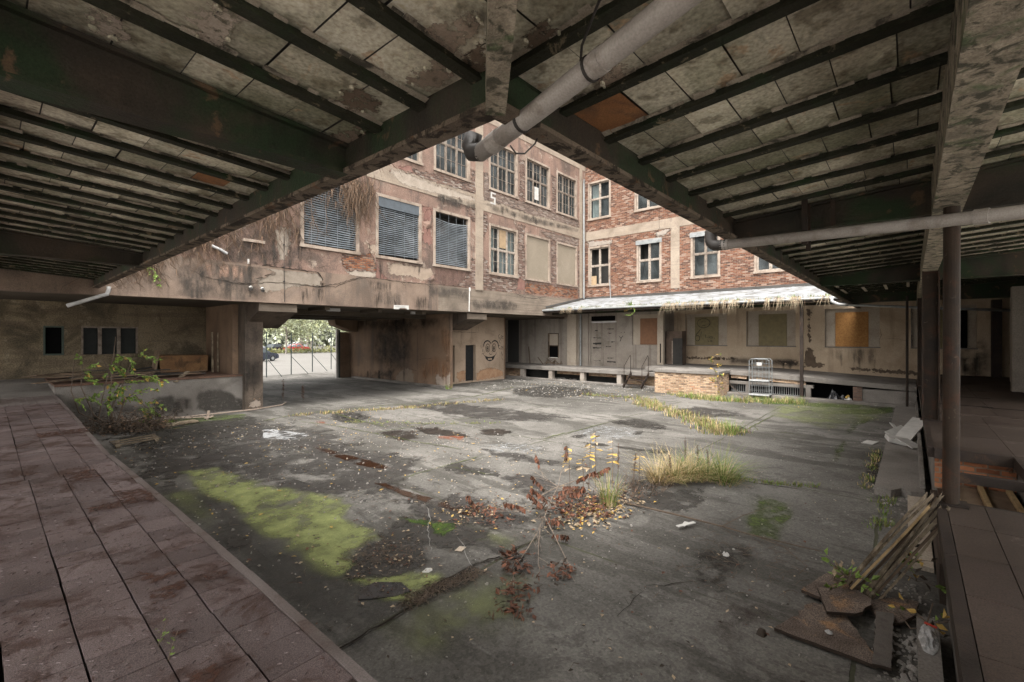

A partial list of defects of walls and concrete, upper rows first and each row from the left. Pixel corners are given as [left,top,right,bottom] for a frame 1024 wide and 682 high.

peeling [335,84,382,114]
crack [191,216,466,298]
spalling [341,242,435,282]
peeling [785,309,825,368]